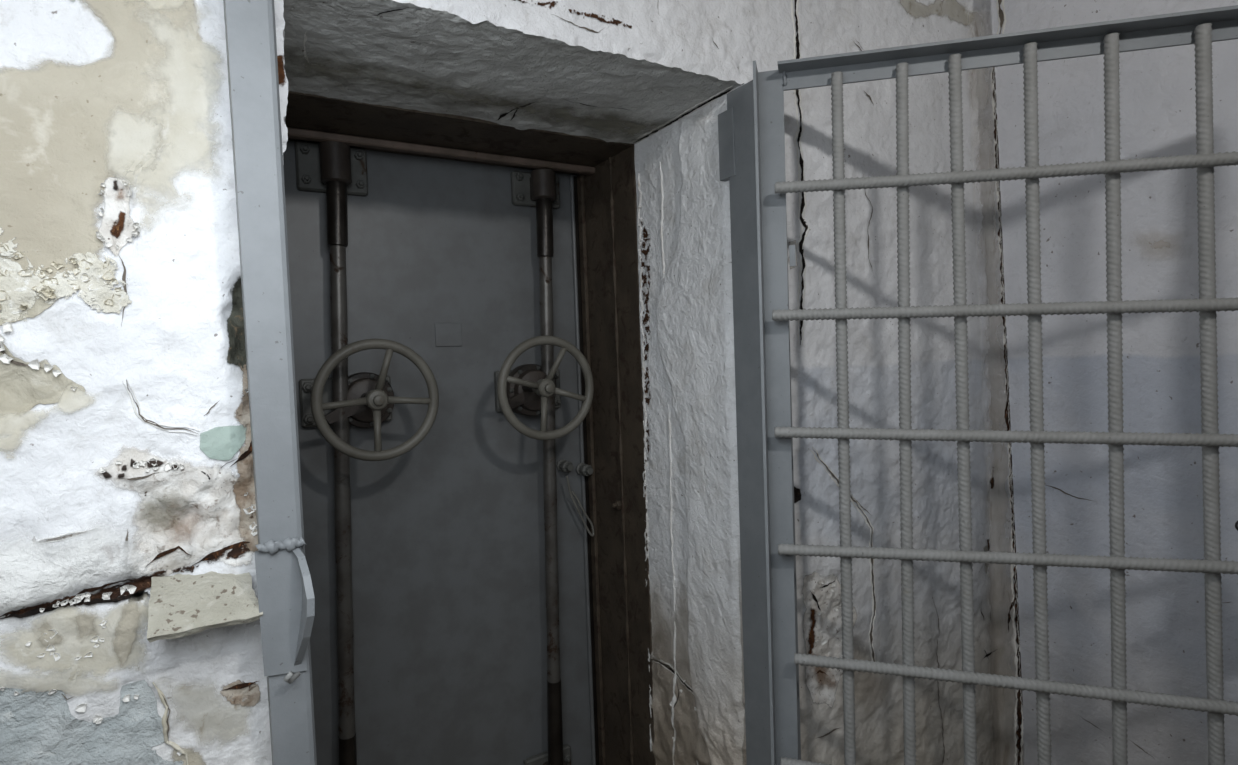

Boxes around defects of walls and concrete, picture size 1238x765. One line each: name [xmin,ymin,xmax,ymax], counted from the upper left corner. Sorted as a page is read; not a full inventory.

rust [514,0,632,28]
crack [791,0,801,59]
crack [996,0,1006,35]
peeling [0,0,220,458]
crack [789,89,810,345]
spalling [0,277,260,765]
crack [981,67,1024,765]